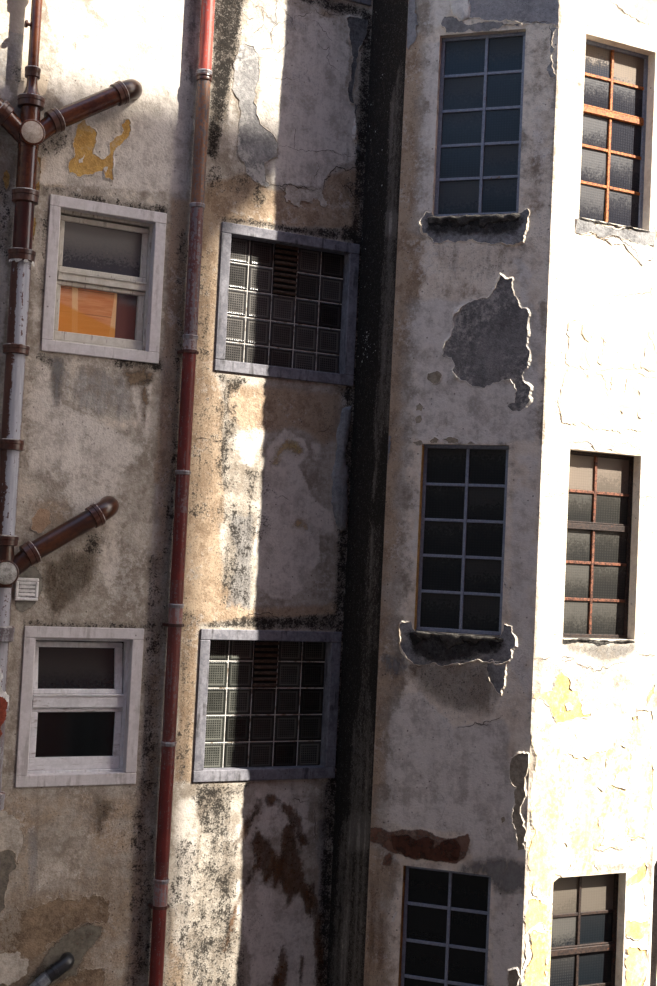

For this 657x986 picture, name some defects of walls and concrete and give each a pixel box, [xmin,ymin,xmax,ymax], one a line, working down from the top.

flaking render [440,0,559,79]
peeling [67,117,134,183]
flaking render [231,43,328,208]
flaking render [426,272,534,413]
flaking render [571,441,646,455]
flaking render [398,620,518,696]
peeling [500,671,656,986]